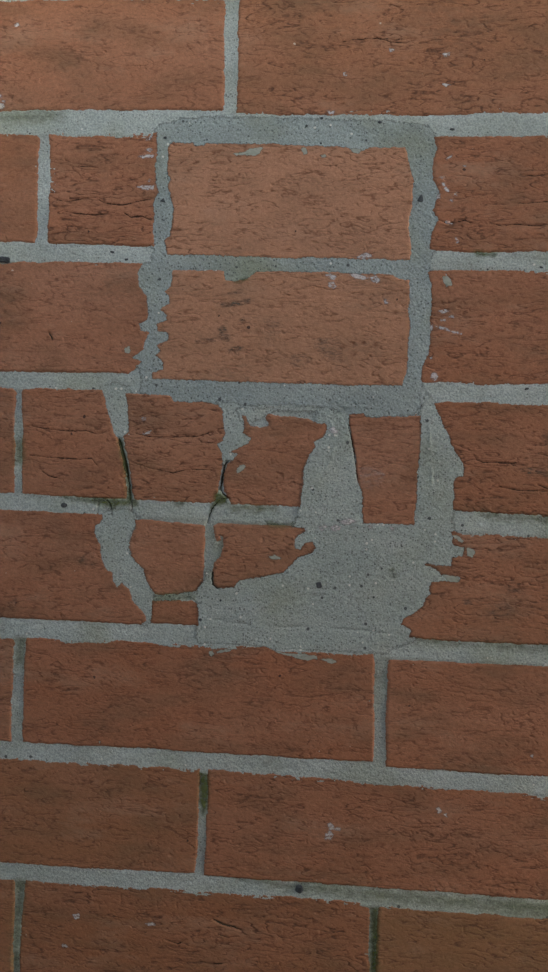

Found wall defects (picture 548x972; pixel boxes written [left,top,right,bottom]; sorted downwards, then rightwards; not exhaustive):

crack [31,455,97,478]
crack [97,432,228,523]